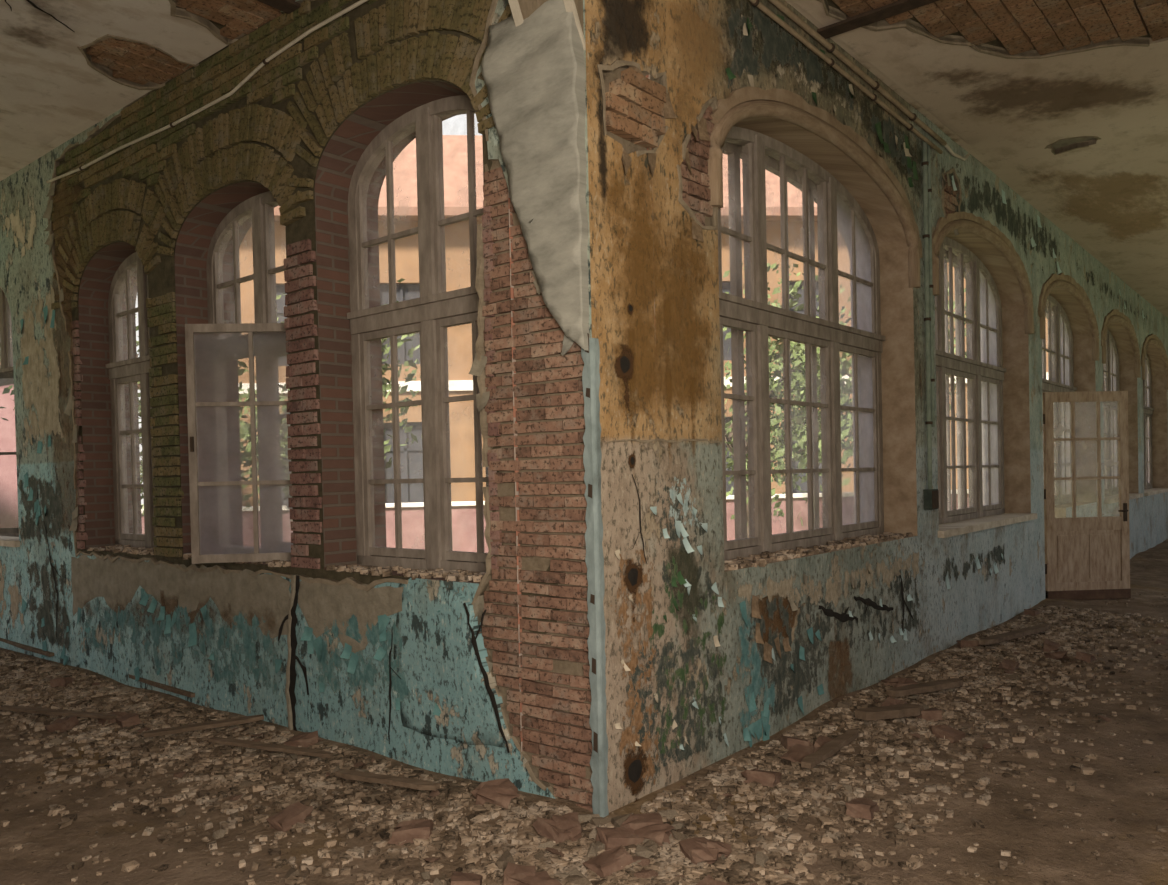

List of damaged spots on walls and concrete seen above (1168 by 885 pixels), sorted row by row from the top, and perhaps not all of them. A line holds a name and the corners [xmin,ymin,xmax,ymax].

crack [5,0,74,32]
peeling [729,15,758,58]
spalling [817,0,1168,59]
peeling [777,55,871,124]
water stain [980,81,1151,113]
water stain [597,0,710,419]
peeling [0,0,677,845]
peeling [943,539,1005,589]
crack [278,575,309,731]
crack [463,603,510,753]
peeling [609,477,920,796]